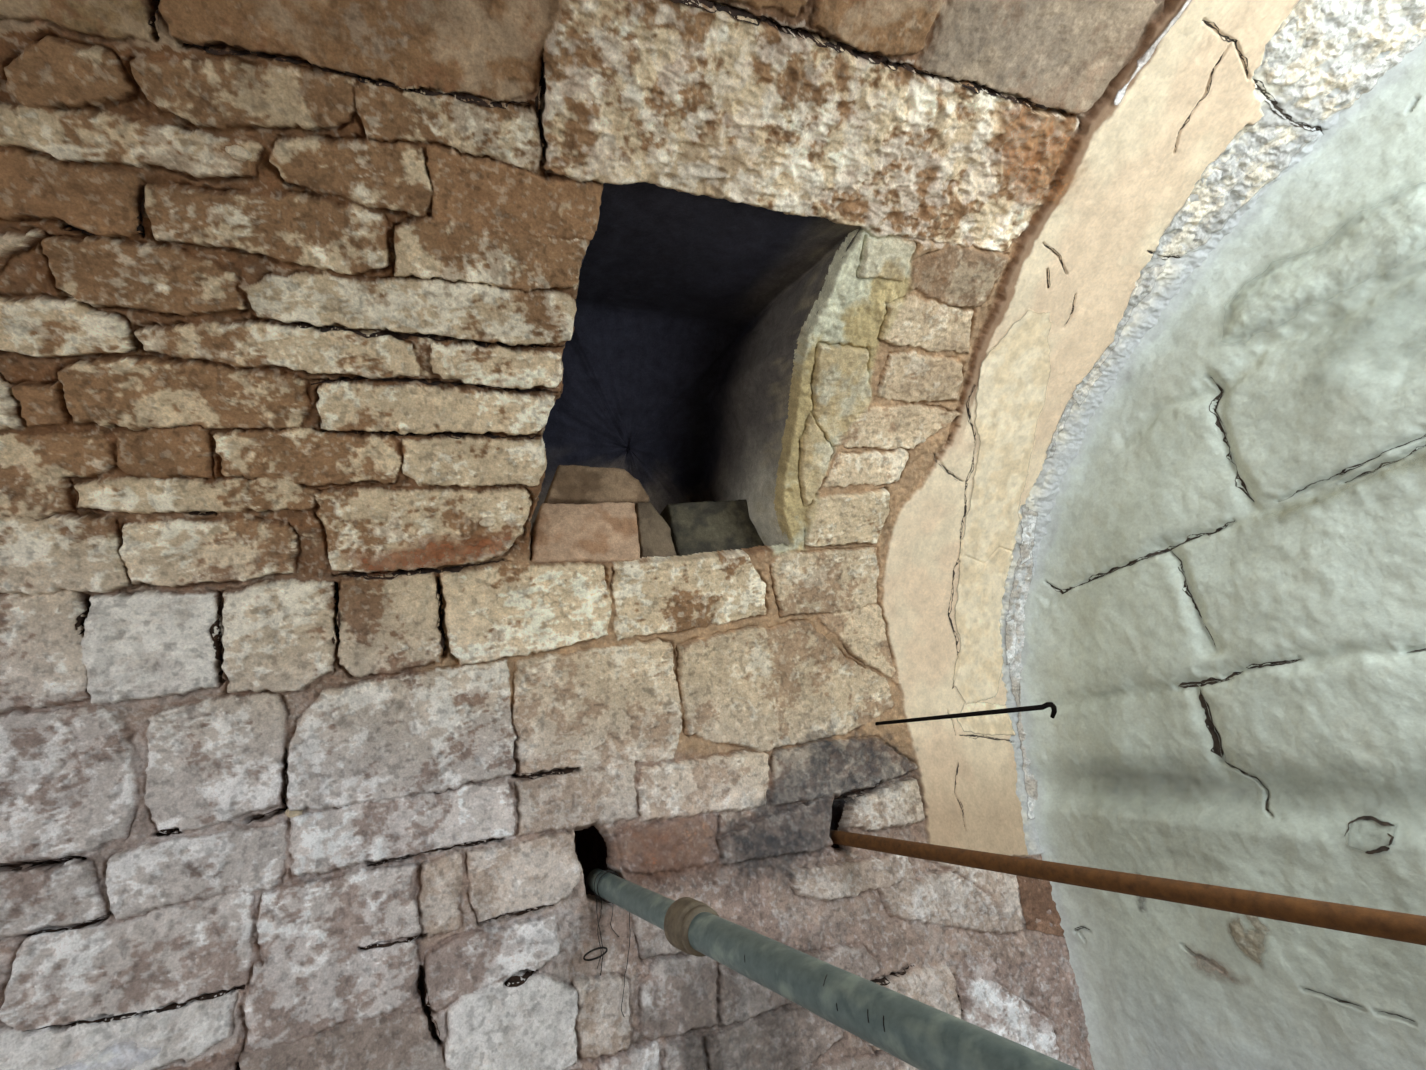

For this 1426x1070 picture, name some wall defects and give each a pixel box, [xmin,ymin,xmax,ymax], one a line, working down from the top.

crack [1175,20,1322,152]
crack [1043,243,1075,326]
peeling [953,0,1426,819]
crack [1047,377,1426,813]
spalling [1345,816,1396,854]
spalling [1229,915,1268,964]